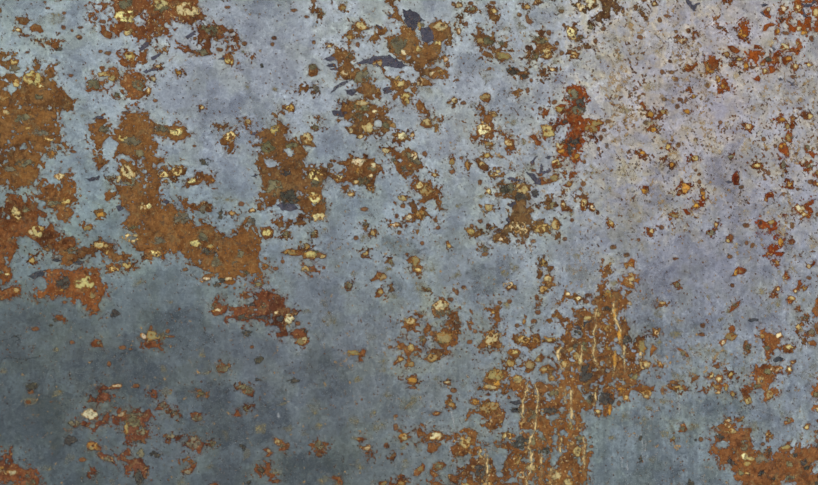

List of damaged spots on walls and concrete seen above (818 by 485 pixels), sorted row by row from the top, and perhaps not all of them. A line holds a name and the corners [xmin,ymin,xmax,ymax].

corrosion [517,0,563,24]
corrosion [119,308,181,354]
corrosion [210,359,266,417]
corrosion [432,378,464,416]
corrosion [0,446,51,485]
corrosion [243,438,297,483]
corrosion [308,435,335,458]